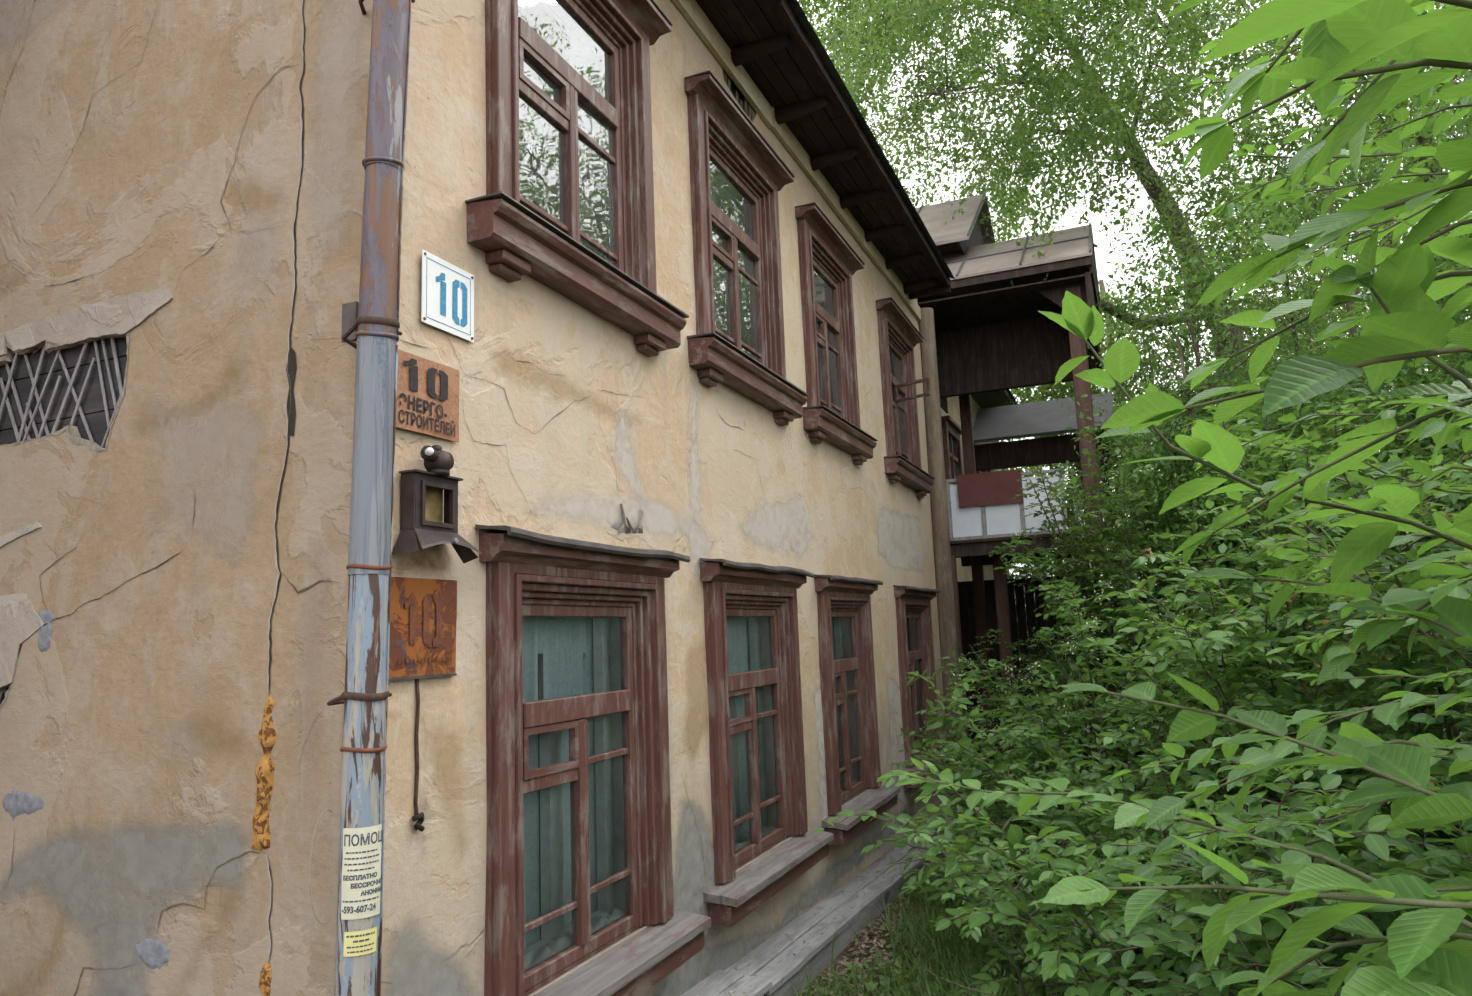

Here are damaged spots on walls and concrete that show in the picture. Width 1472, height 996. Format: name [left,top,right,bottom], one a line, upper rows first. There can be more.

flaking render [0,289,173,452]
crack [176,0,339,695]
crack [402,334,648,515]
flaking render [0,522,42,548]
flaking render [0,594,44,709]
crack [18,486,195,654]
damp [3,827,242,996]